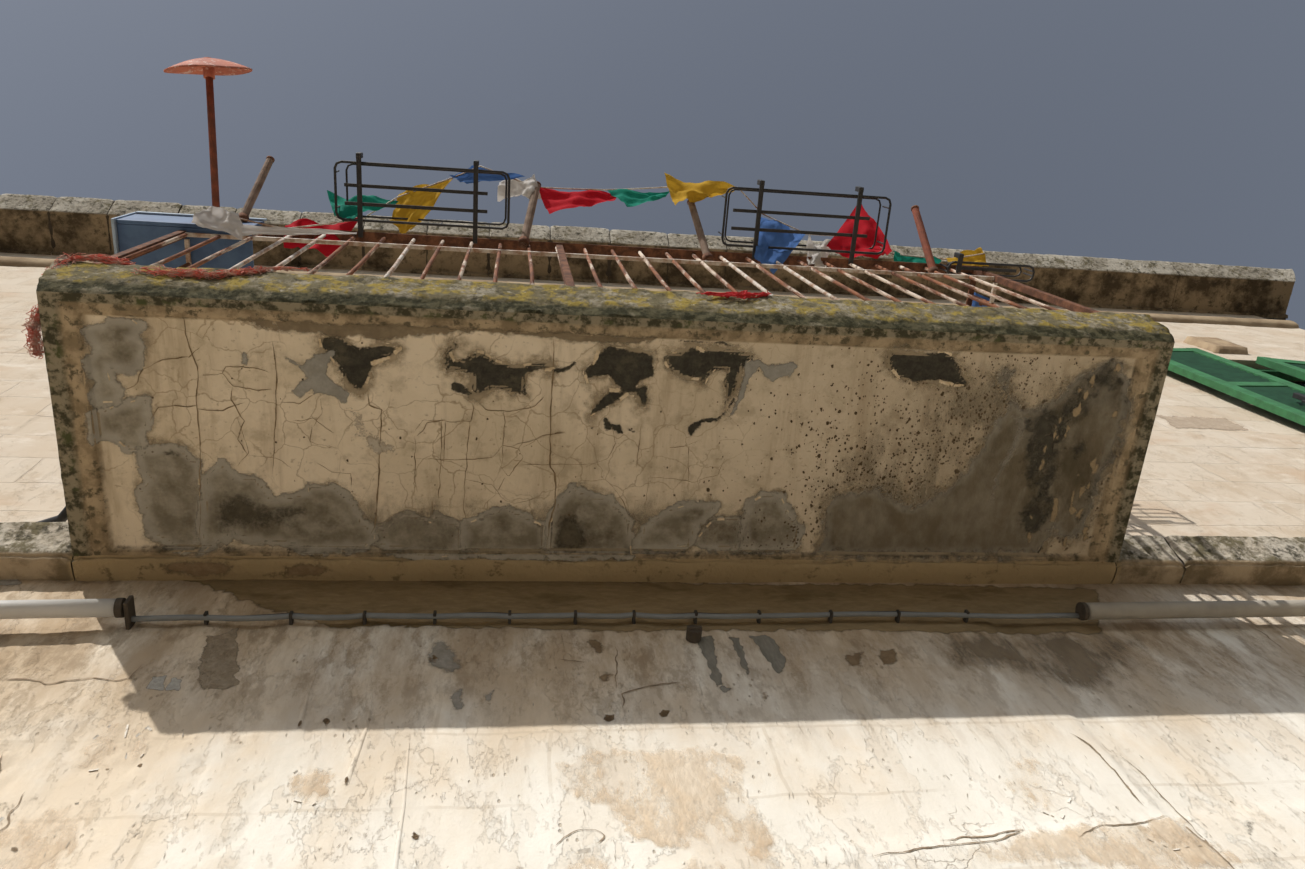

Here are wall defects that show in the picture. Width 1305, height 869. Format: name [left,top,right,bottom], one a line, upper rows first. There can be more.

crack [125,315,382,533]
peeling [80,317,806,562]
crack [414,340,726,548]
water stain [703,347,1134,563]
peeling [883,348,971,390]
crack [875,829,1023,856]